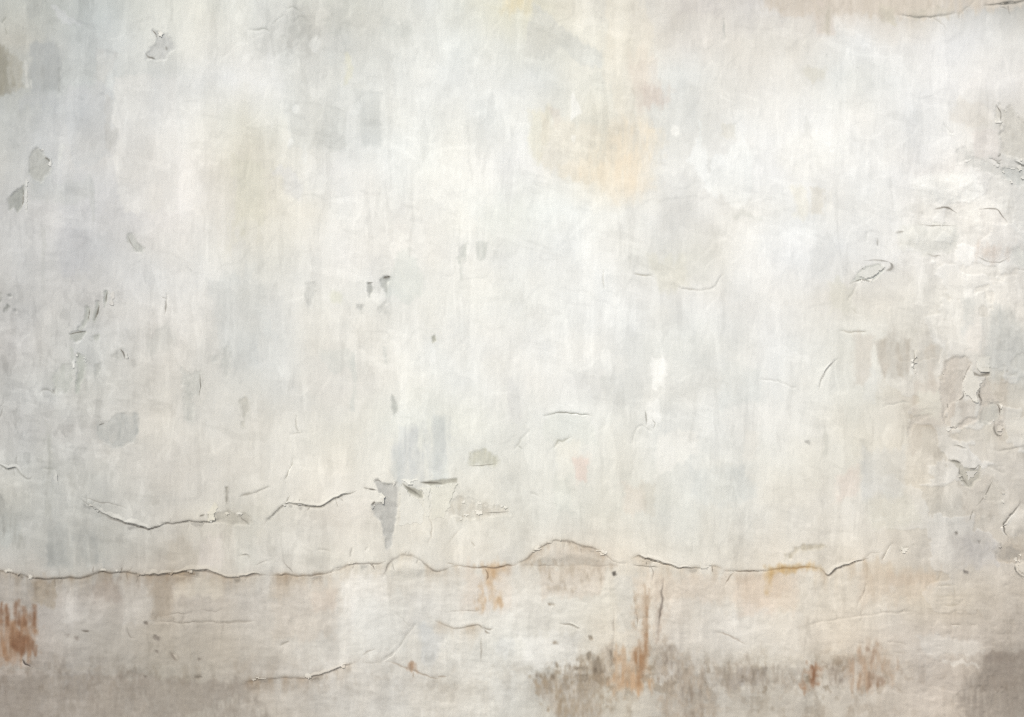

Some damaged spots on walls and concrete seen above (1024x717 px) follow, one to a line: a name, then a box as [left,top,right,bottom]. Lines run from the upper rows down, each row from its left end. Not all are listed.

peeling [6,144,54,214]
peeling [849,258,896,284]
peeling [938,354,1006,437]
peeling [946,458,982,490]
peeling [364,477,515,551]
crack [0,515,915,659]
corrosion [0,597,45,676]
damp [532,646,616,682]
corrosion [602,639,656,703]
damp [657,641,731,717]
damp [748,663,780,691]
damp [950,642,1024,717]